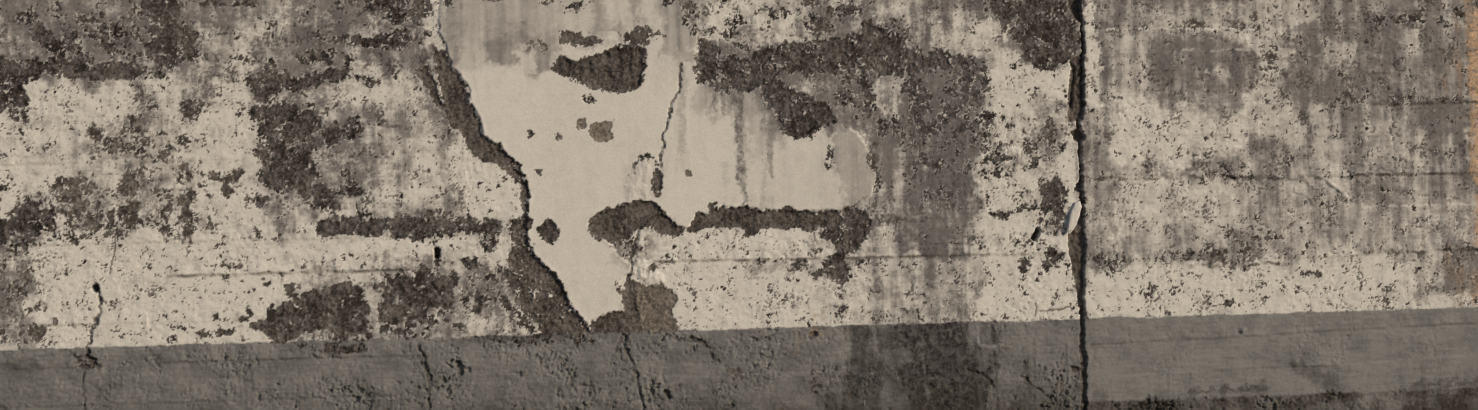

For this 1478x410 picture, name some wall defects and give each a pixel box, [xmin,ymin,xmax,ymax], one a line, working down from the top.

crack [68,228,119,410]
spalling [0,0,1081,356]
crack [965,0,1089,410]
damp [817,0,1353,410]
damp [1262,0,1457,210]
damp [1386,360,1478,410]
corrosion [1440,0,1478,308]